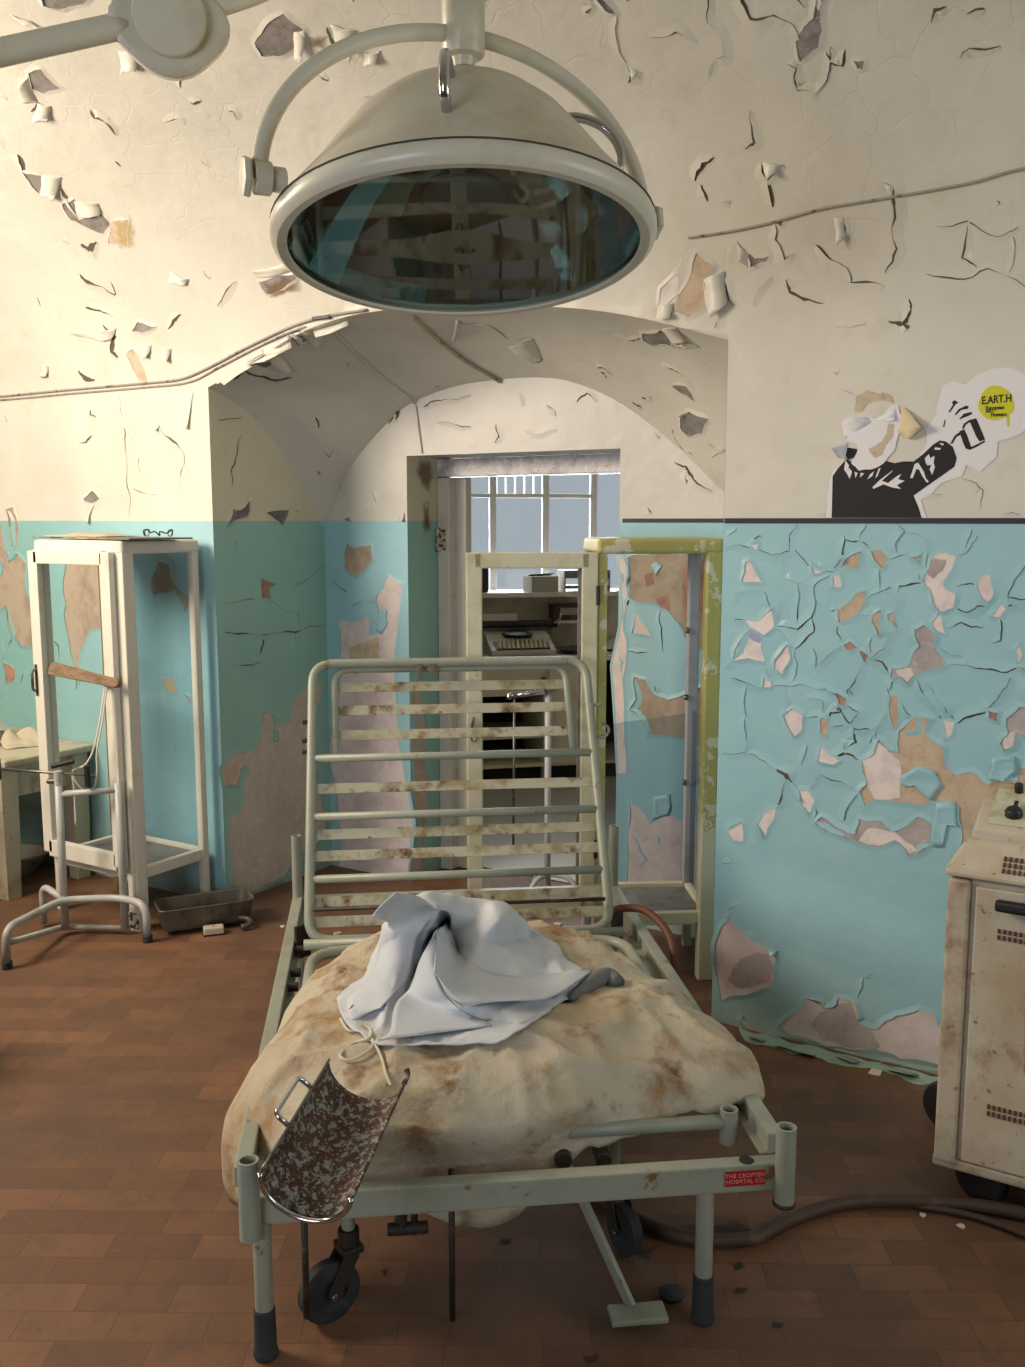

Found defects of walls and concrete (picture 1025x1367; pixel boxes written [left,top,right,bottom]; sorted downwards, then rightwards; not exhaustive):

peeling [250,8,357,63]
crack [931,6,1001,60]
peeling [12,154,132,249]
crack [689,111,1025,335]
peeling [217,320,349,385]
crack [79,391,242,516]
peeling [0,504,33,685]
flaking render [53,564,101,691]
flaking render [218,540,430,895]
peeling [610,554,704,788]
flaking render [779,544,1025,860]
flaking render [711,912,941,1085]